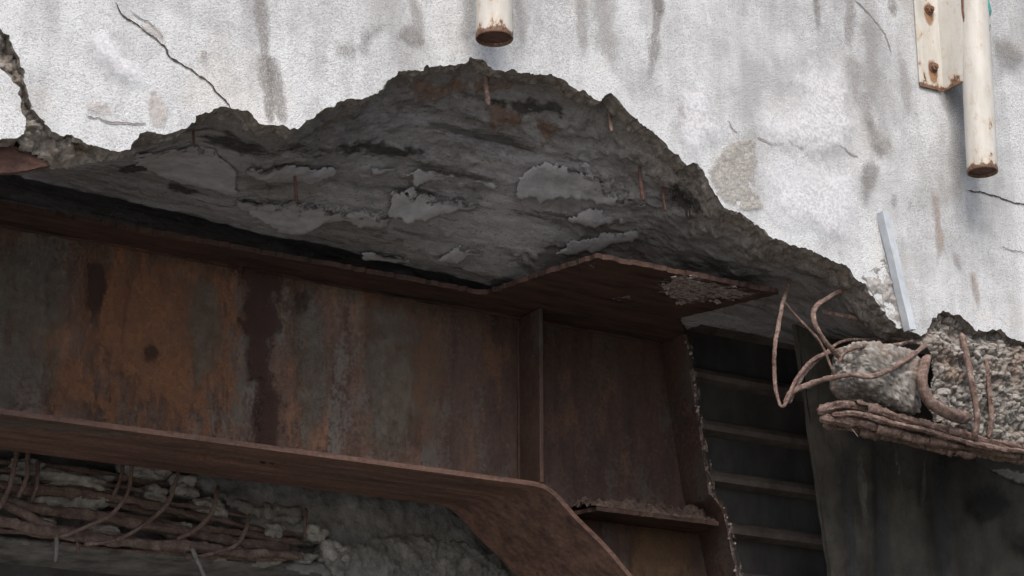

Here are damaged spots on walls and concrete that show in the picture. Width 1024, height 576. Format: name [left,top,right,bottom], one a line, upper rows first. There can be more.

crack [115,2,232,110]
water stain [255,0,286,121]
water stain [649,0,664,74]
crack [968,190,1024,205]
spalling [134,66,1024,483]
corrosion [229,264,311,446]
spalling [0,451,515,576]